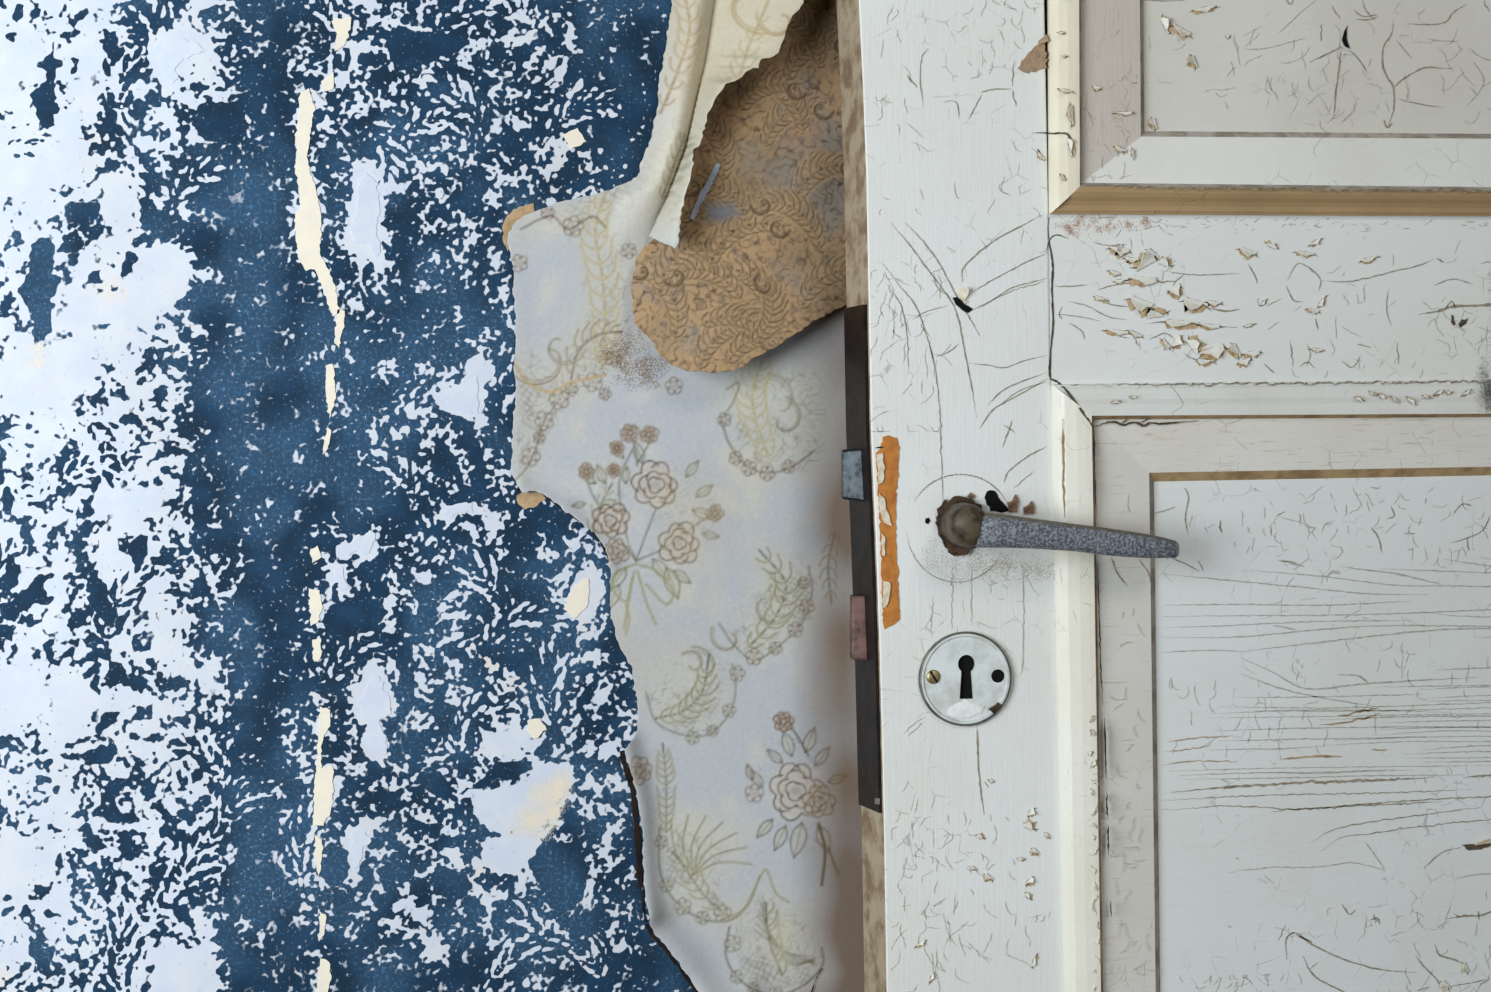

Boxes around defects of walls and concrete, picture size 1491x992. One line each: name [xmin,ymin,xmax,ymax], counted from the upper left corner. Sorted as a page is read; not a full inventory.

crack [875,0,1040,151]
crack [1205,0,1491,137]
peeling [294,72,345,347]
peeling [1093,244,1262,368]
crack [870,29,1491,504]
peeling [322,364,336,455]
peeling [308,589,323,662]
peeling [310,530,375,590]
peeling [312,707,334,876]
peeling [358,674,391,754]
crack [1106,485,1491,992]
peeling [317,911,332,992]